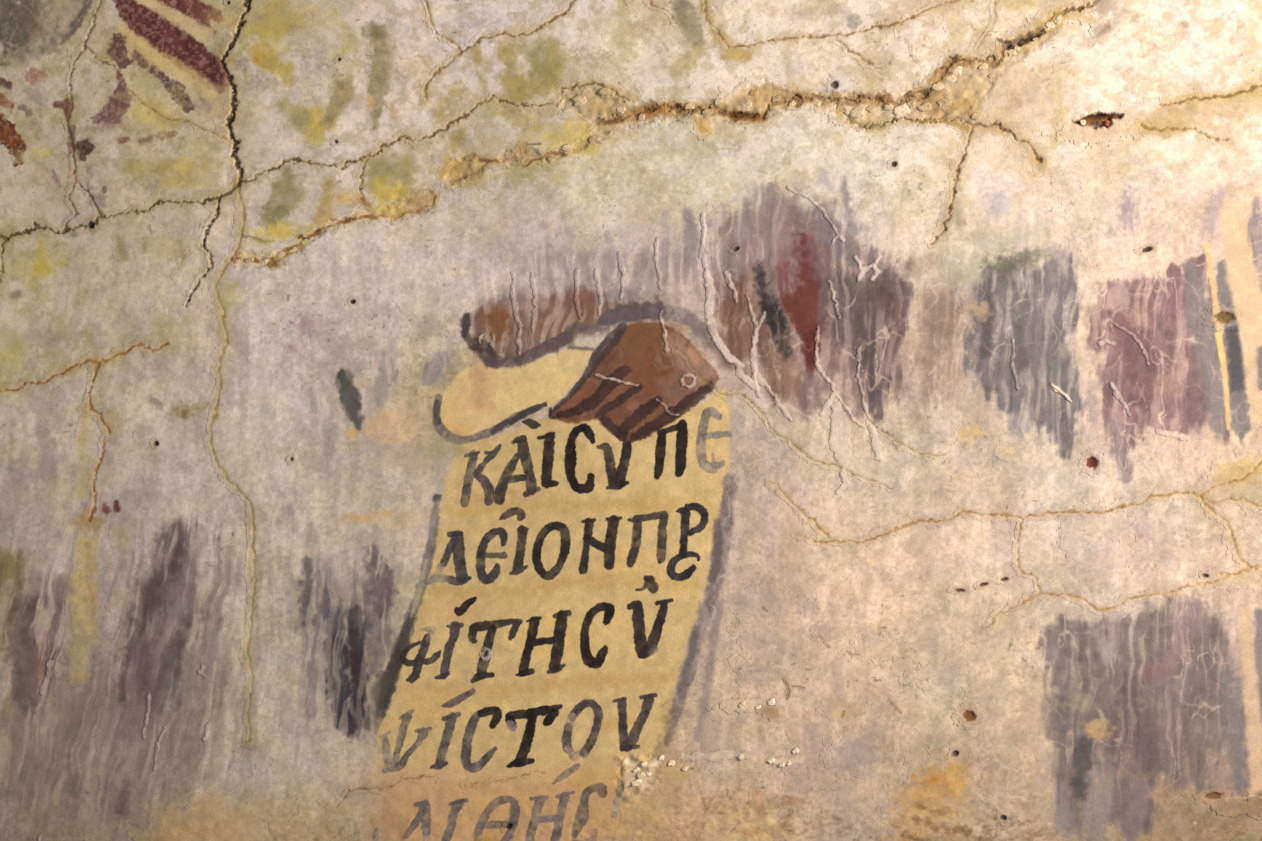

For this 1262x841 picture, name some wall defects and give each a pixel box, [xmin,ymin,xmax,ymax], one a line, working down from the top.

spalling [225,0,1122,271]
crack [619,0,1094,249]
spalling [1042,112,1154,149]
crack [1135,78,1262,145]
crack [0,0,680,749]
crack [672,345,1262,631]